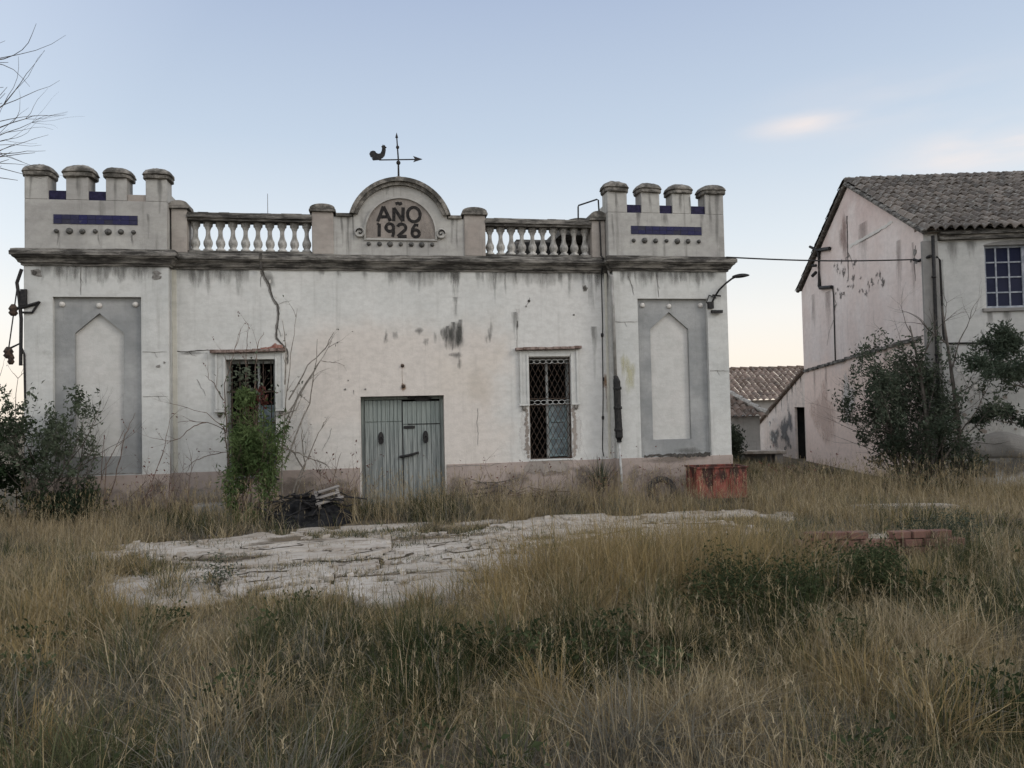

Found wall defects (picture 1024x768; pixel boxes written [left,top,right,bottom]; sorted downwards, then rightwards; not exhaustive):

damp [444,319,462,364]
crack [161,521,754,582]